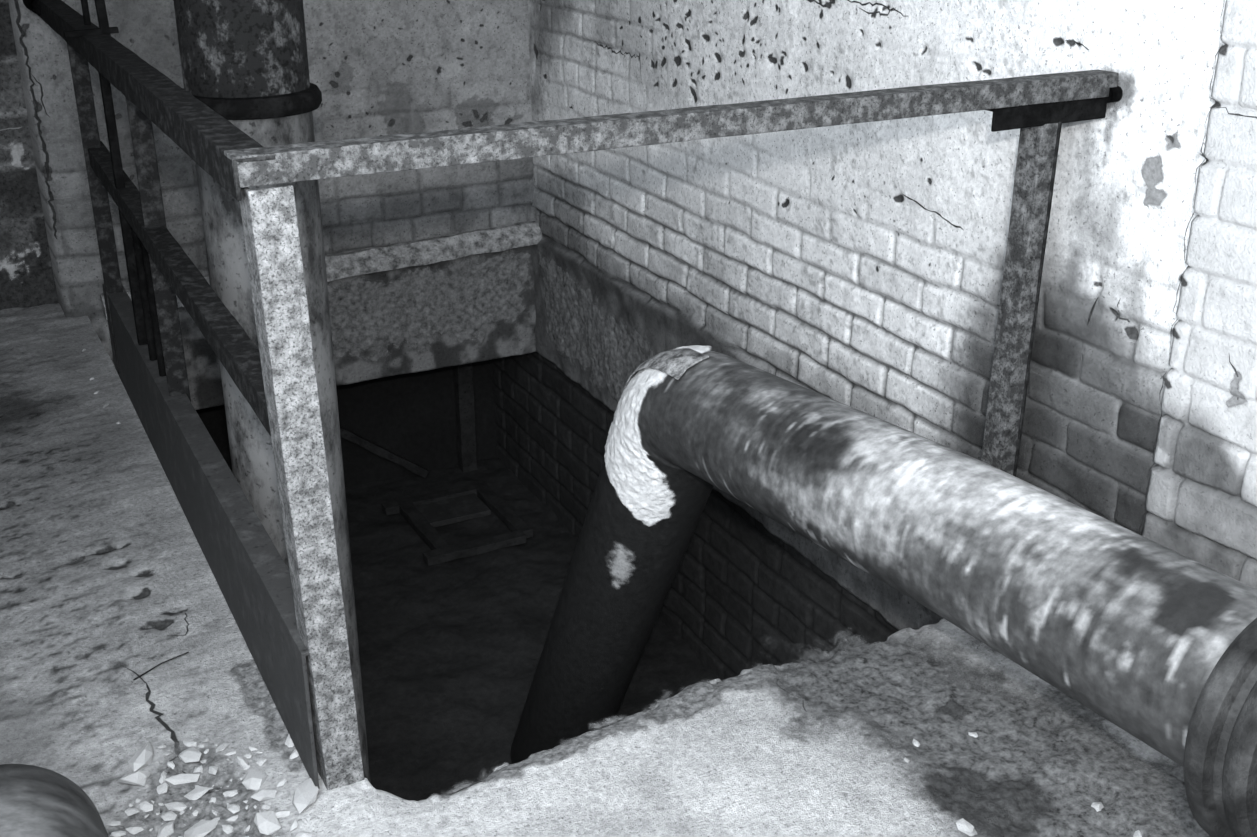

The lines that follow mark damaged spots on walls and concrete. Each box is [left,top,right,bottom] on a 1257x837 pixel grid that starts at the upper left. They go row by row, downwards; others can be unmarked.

crack [808,0,903,18]
peeling [1053,37,1081,47]
peeling [1141,133,1181,206]
crack [904,195,963,230]
crack [1139,4,1257,535]
crack [1087,298,1138,334]
crack [125,667,186,774]